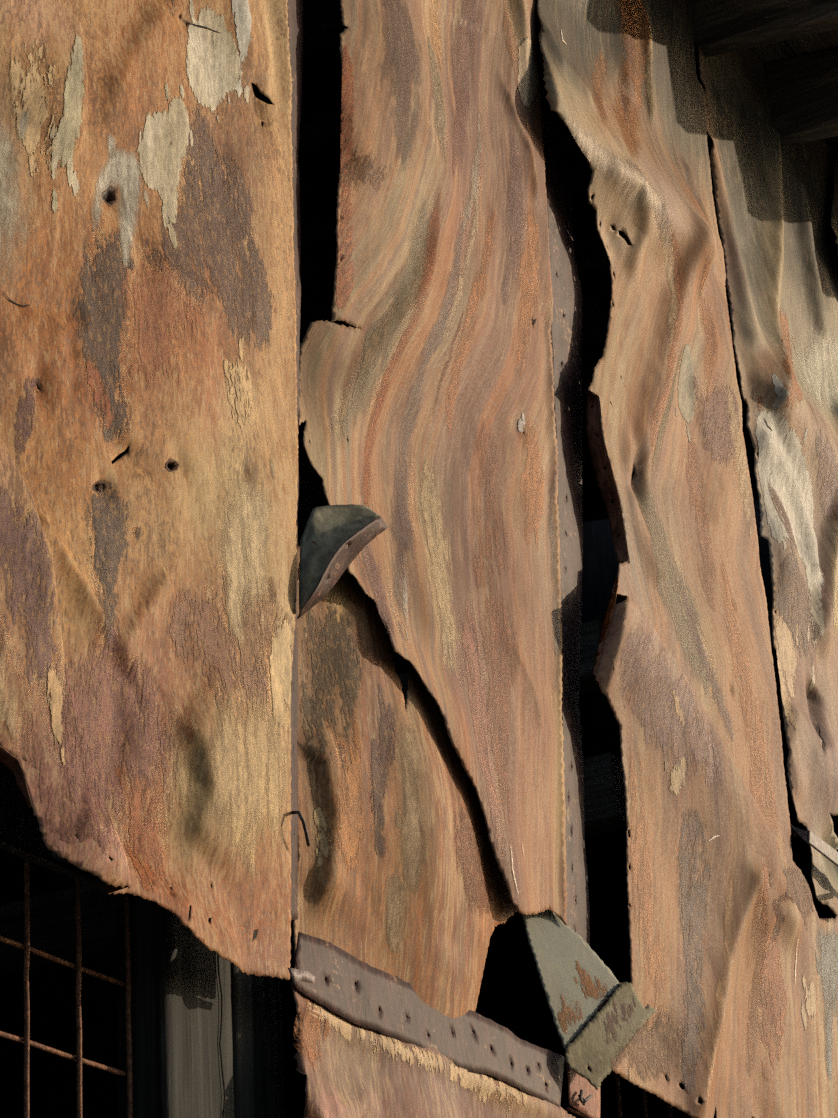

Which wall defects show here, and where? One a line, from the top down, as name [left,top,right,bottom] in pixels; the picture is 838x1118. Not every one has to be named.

peeling [10,34,84,213]
corrosion [74,107,276,443]
peeling [137,0,252,249]
corrosion [336,46,386,309]
peeling [755,373,824,731]
peeling [47,663,65,766]
corrosion [0,481,184,895]
corrosion [300,606,396,872]
corrosion [453,808,493,915]
corrosion [558,752,712,1094]
corrosion [620,628,721,785]
corrosion [748,861,814,1080]